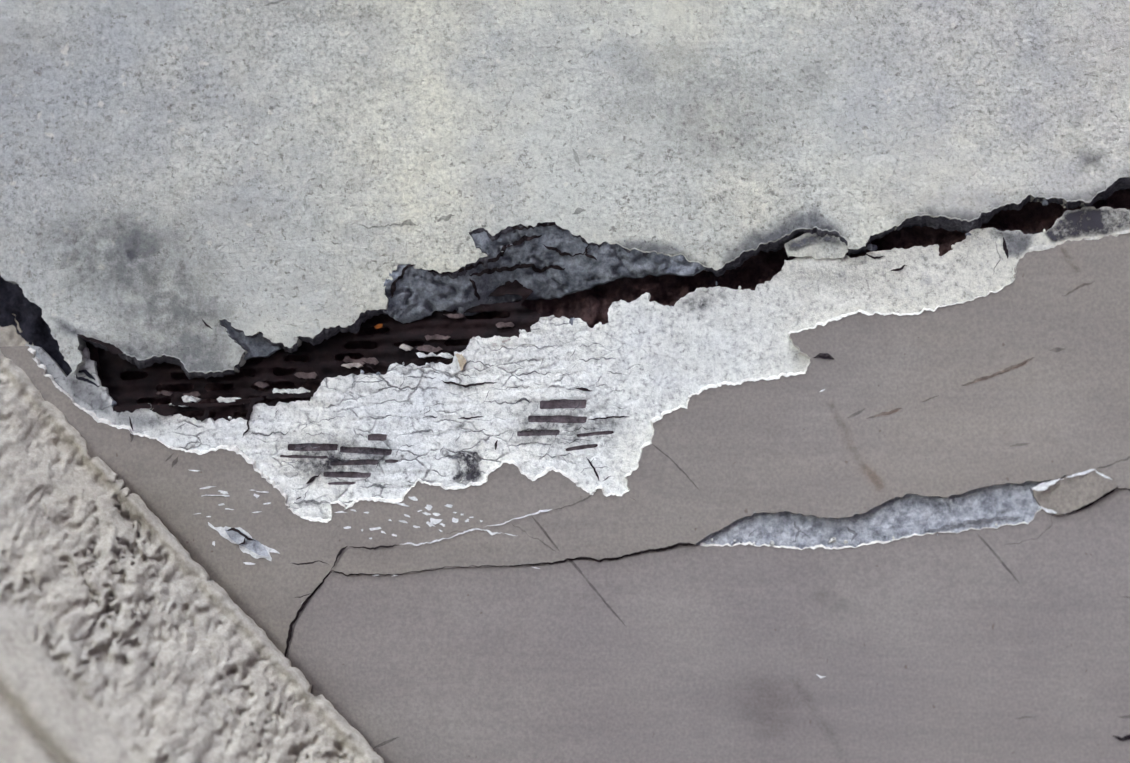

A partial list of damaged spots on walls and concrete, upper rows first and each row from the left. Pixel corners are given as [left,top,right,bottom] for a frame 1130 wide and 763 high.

flaking render [26,206,1130,550]
flaking render [197,486,280,565]
crack [284,509,695,657]
crack [1066,456,1130,514]